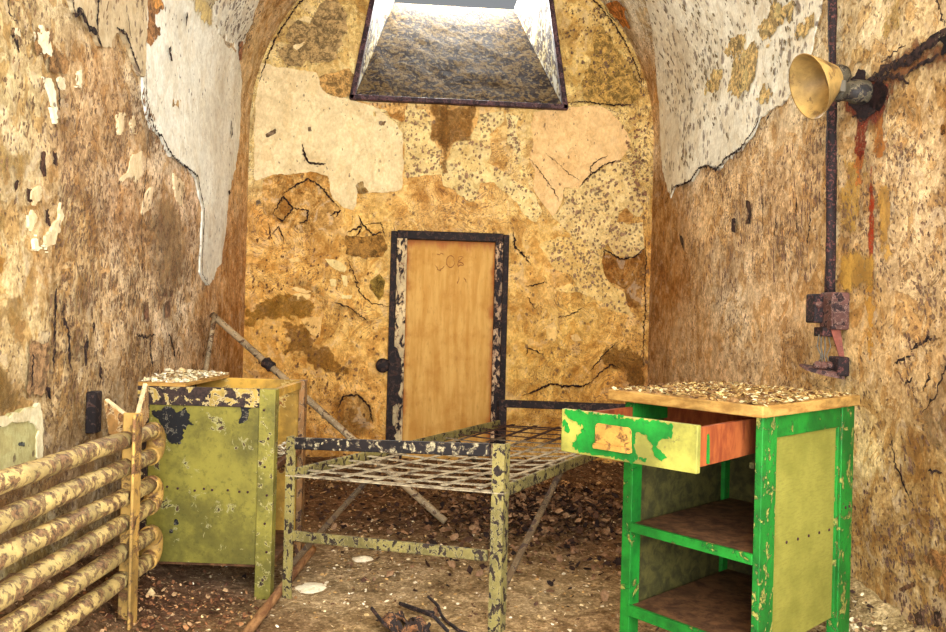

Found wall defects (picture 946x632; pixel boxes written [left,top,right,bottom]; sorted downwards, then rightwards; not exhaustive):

peeling [0,0,262,470]
peeling [252,0,440,424]
damp [430,104,476,173]
peeling [441,0,823,310]
rust [839,113,893,361]
crack [867,28,946,98]
crack [890,433,914,506]
crack [893,335,932,391]